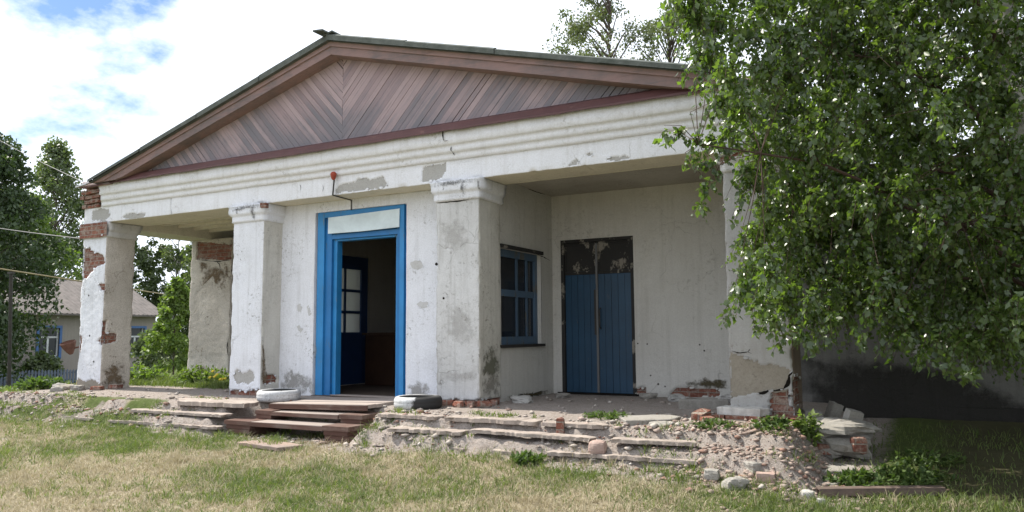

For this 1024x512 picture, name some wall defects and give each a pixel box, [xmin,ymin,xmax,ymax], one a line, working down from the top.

flaking render [335,176,388,194]
flaking render [422,162,446,182]
flaking render [79,189,145,290]
flaking render [196,242,233,261]
flaking render [80,321,116,350]
flaking render [635,352,801,417]